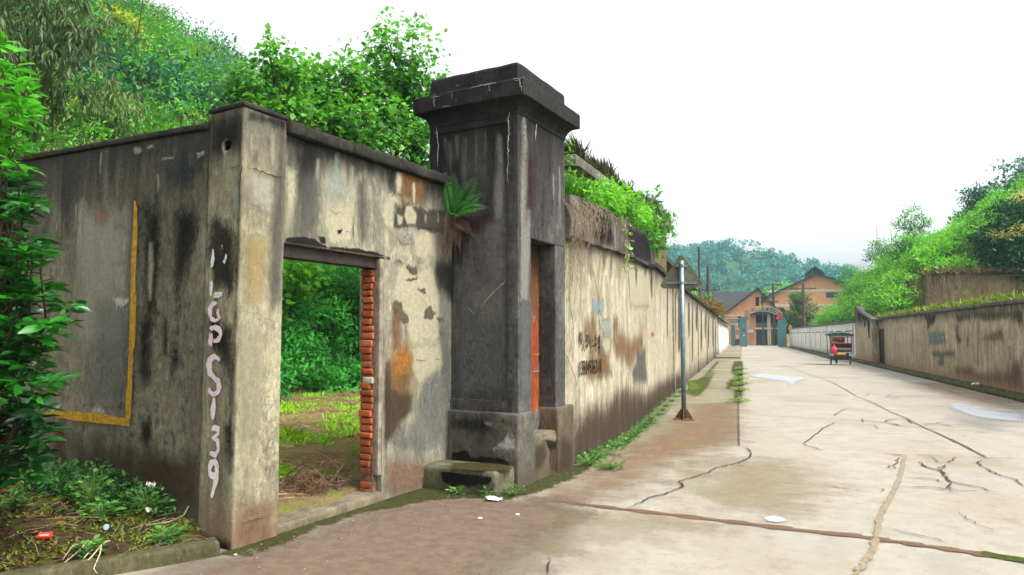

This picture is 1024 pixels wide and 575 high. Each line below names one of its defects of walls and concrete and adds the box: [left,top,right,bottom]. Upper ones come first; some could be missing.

damp [173,114,366,304]
damp [136,201,178,389]
damp [206,315,233,377]
peeling [286,194,445,383]
corrosion [386,310,412,428]
damp [536,318,681,470]
crack [632,448,752,506]
crack [788,393,953,450]
crack [824,456,1023,529]